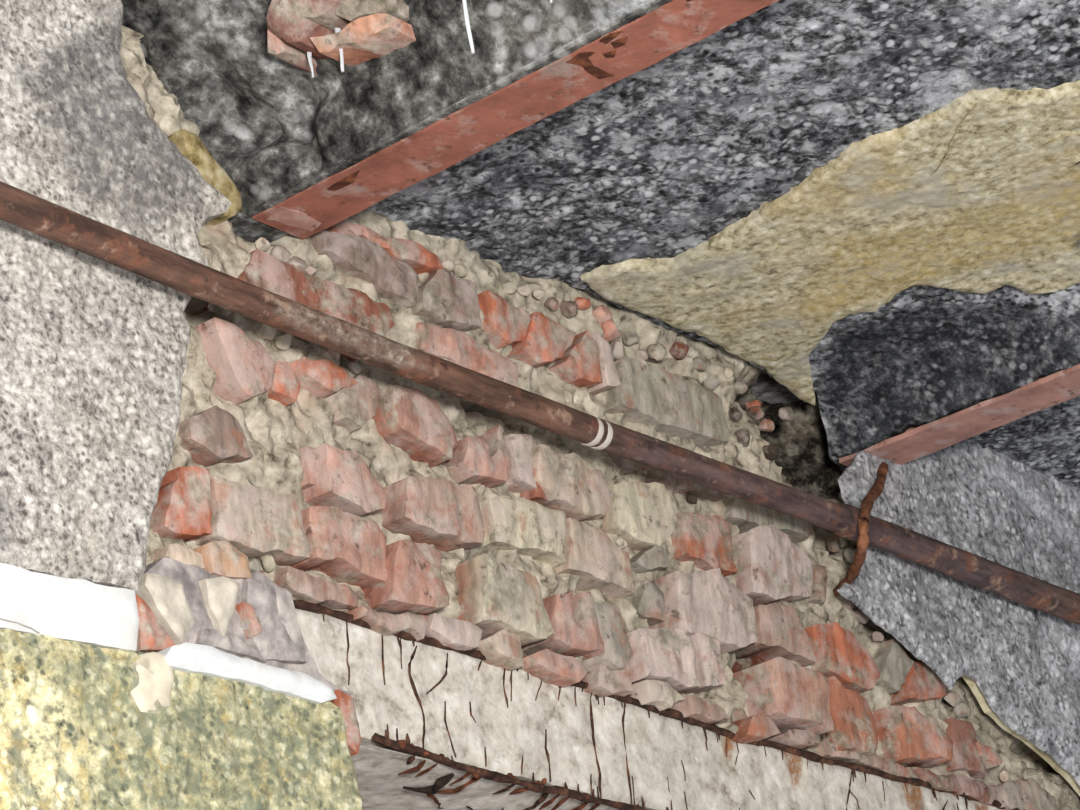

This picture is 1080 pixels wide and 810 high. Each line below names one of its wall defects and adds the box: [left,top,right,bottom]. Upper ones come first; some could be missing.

spalling [266,0,416,74]
crack [930,102,978,176]
flaking render [119,25,1080,504]
flaking render [135,296,1080,810]
crack [0,618,40,633]
crack [846,772,860,810]